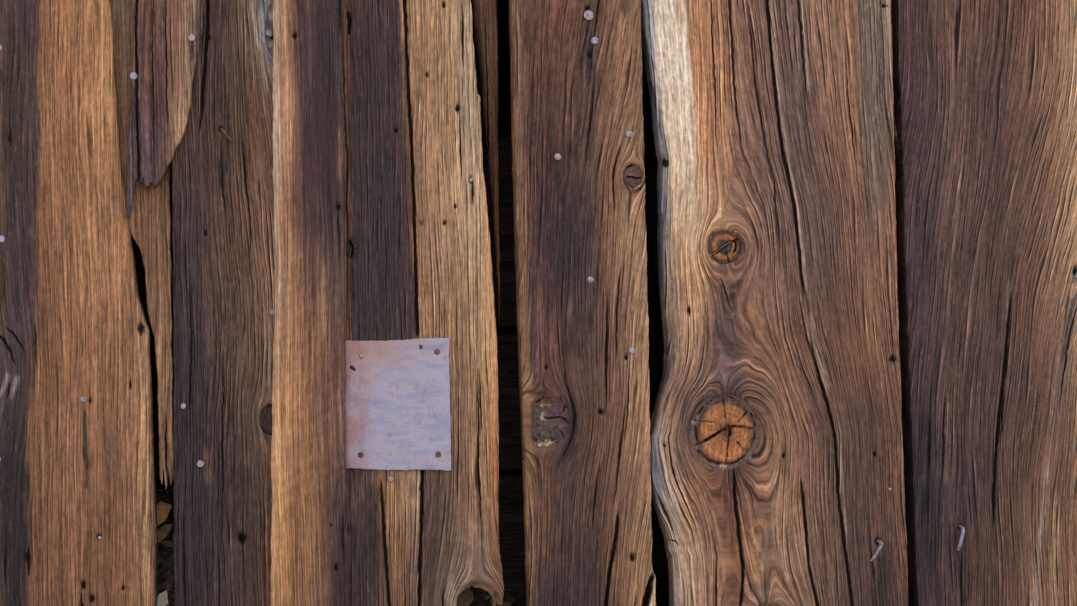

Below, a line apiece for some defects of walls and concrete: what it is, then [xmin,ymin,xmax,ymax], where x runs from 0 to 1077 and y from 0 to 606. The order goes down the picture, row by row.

crack [135,0,168,180]
crack [711,0,804,293]
crack [592,270,630,606]
crack [634,574,654,606]
crack [800,478,819,606]
crack [810,341,854,606]
crack [992,294,1012,527]